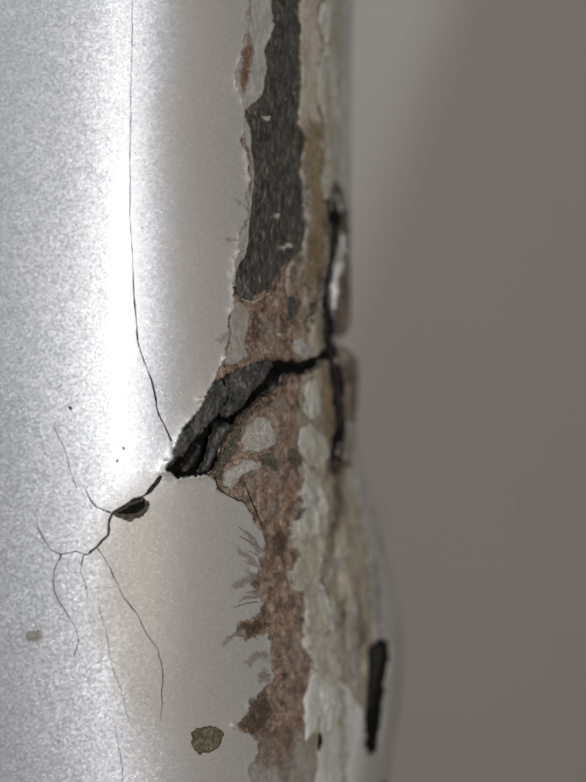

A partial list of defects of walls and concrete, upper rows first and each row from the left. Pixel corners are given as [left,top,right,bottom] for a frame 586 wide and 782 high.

crack [35,3,353,781]
peeling [214,398,278,491]
peeling [224,0,275,366]
peeling [248,0,389,782]